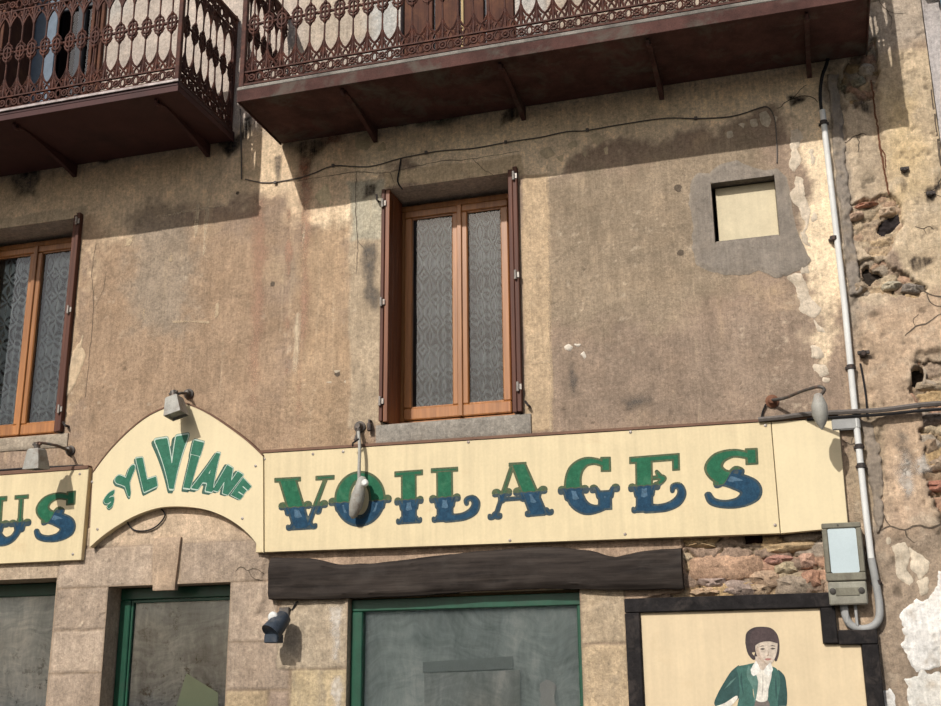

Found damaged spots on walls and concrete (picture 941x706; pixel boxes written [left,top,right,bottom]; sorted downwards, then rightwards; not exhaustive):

spalling [841,40,879,109]
flaking render [789,129,817,247]
crack [845,80,889,194]
crack [924,89,941,198]
leakage [363,246,377,304]
flaking render [787,265,825,333]
spalling [849,196,925,298]
crack [905,285,941,336]
spalling [909,359,941,513]
spalling [651,531,826,598]
peeling [886,537,941,706]
peeling [883,688,896,706]